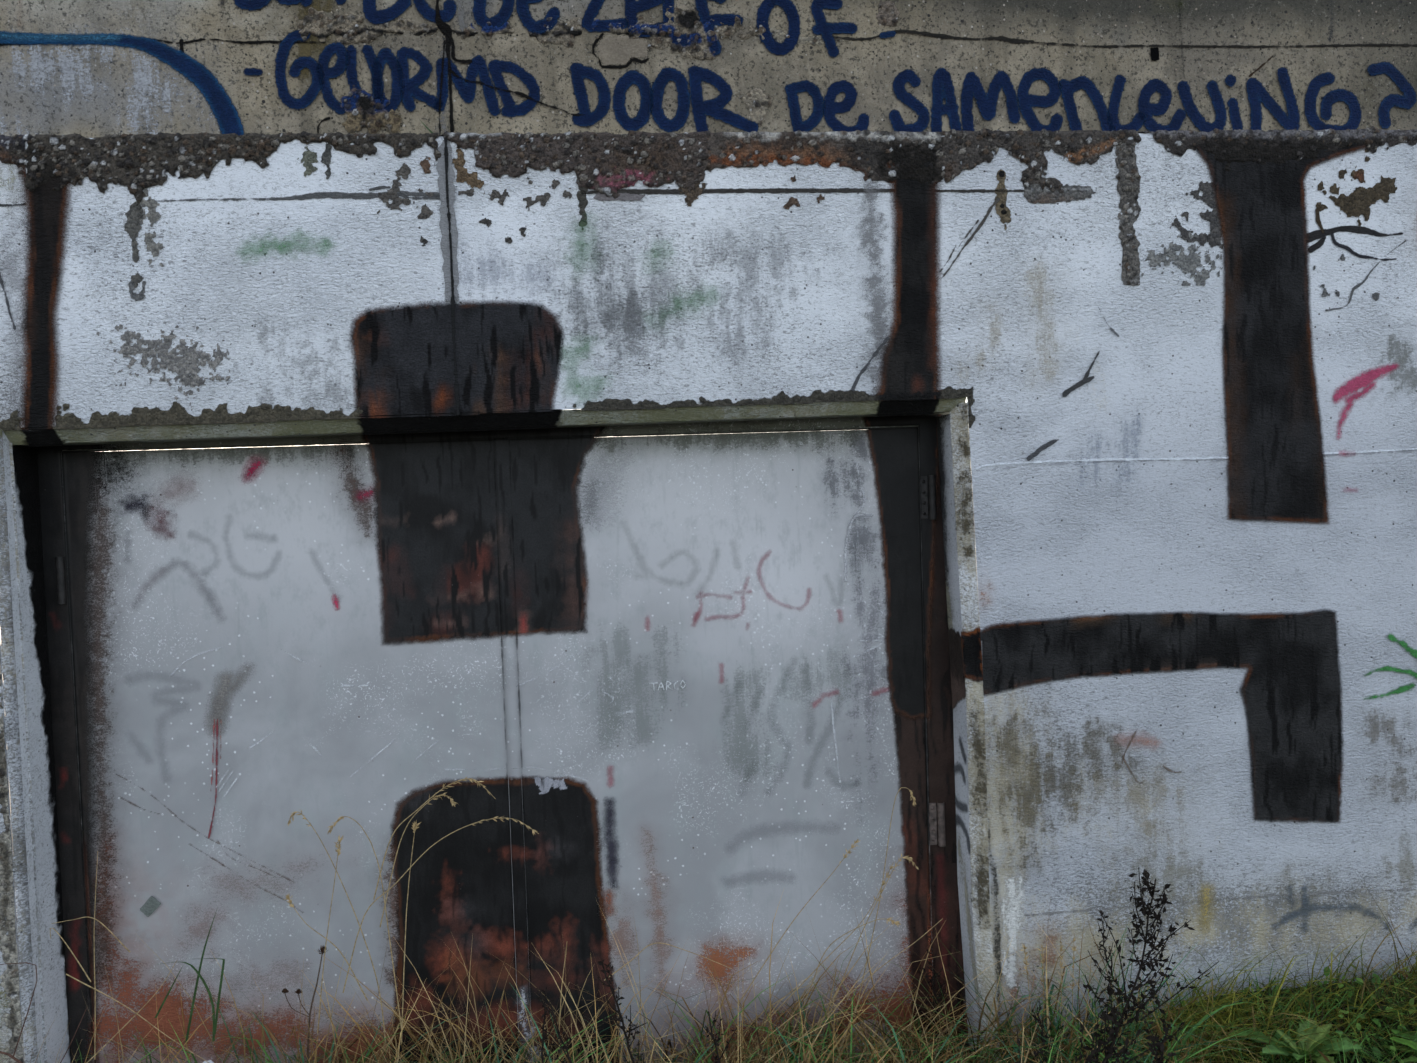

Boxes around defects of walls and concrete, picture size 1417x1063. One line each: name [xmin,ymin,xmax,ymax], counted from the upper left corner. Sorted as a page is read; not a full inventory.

crack [154,38,326,52]
crack [435,0,584,135]
crack [592,33,649,69]
crack [833,30,1417,77]
spalling [0,85,1417,244]
peeling [1141,181,1223,287]
spalling [52,324,363,429]
water stain [955,405,974,558]
spalling [0,660,24,1063]
rust [88,838,396,1063]
rust [672,894,935,1063]
water stain [958,710,1138,1047]